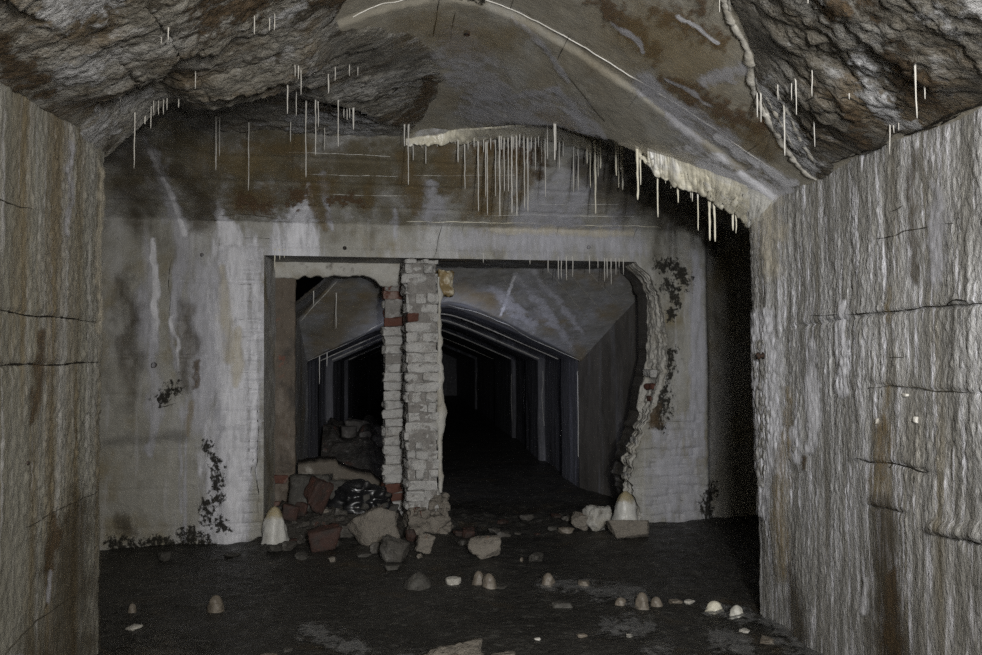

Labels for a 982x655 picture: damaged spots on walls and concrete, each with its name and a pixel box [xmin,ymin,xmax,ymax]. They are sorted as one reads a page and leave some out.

crack [0,359,94,367]
crack [2,310,97,322]
water stain [96,168,105,333]
water stain [103,23,720,550]
water stain [620,64,799,273]
crack [818,299,982,316]